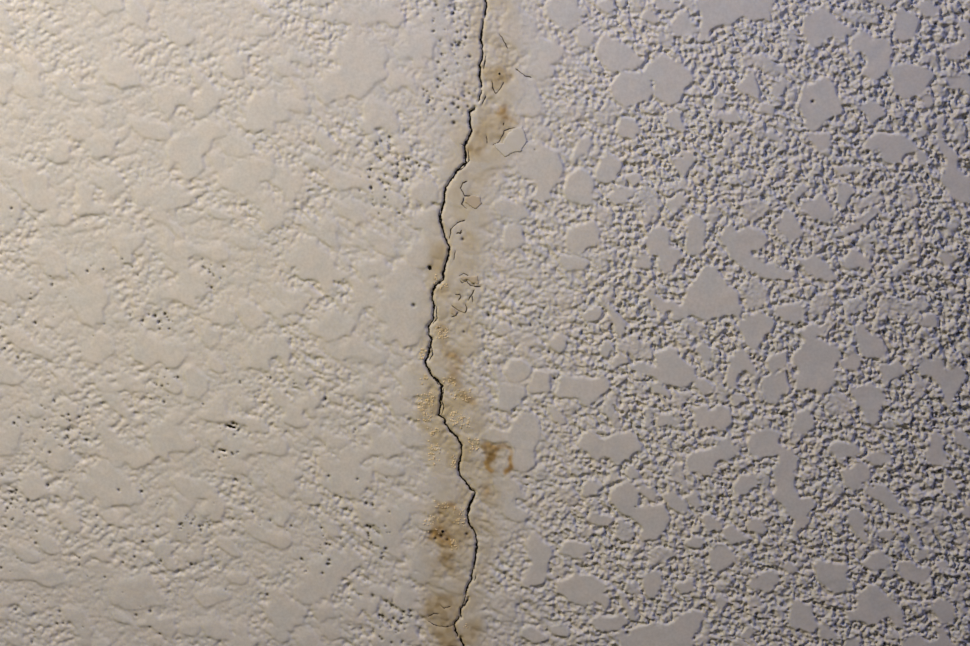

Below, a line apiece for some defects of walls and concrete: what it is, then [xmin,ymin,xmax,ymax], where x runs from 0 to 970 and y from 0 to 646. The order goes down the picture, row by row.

leakage [402,0,531,646]
crack [424,0,531,646]